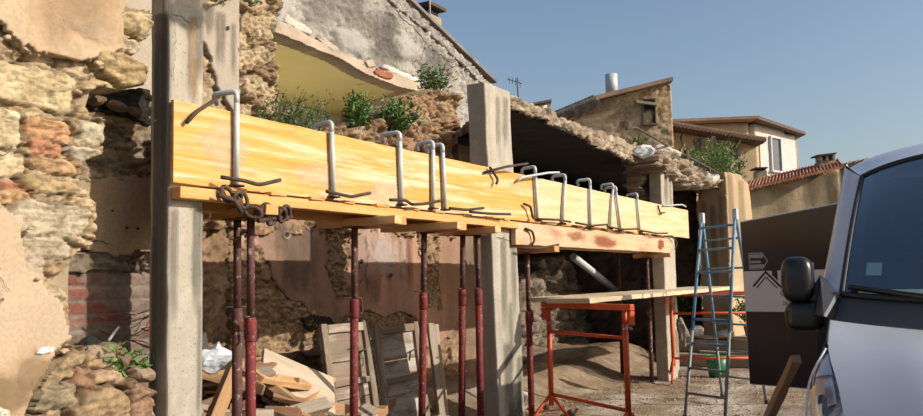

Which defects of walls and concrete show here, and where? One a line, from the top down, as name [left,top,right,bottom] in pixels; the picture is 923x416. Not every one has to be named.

spalling [0,6,154,354]
spalling [225,228,319,357]
spalling [325,228,364,297]
spalling [338,309,419,347]